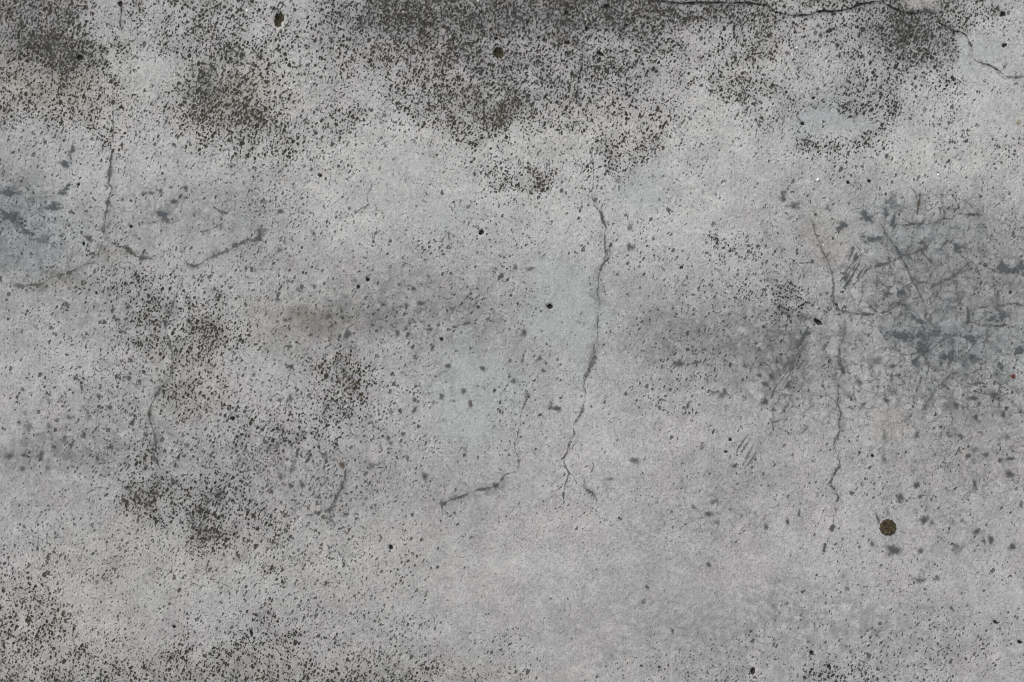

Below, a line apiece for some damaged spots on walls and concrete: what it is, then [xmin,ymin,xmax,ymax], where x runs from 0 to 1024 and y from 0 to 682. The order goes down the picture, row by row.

crack [656,0,1017,78]
crack [557,46,606,497]
crack [967,276,1024,327]
crack [804,194,985,552]
corrosion [879,519,896,536]